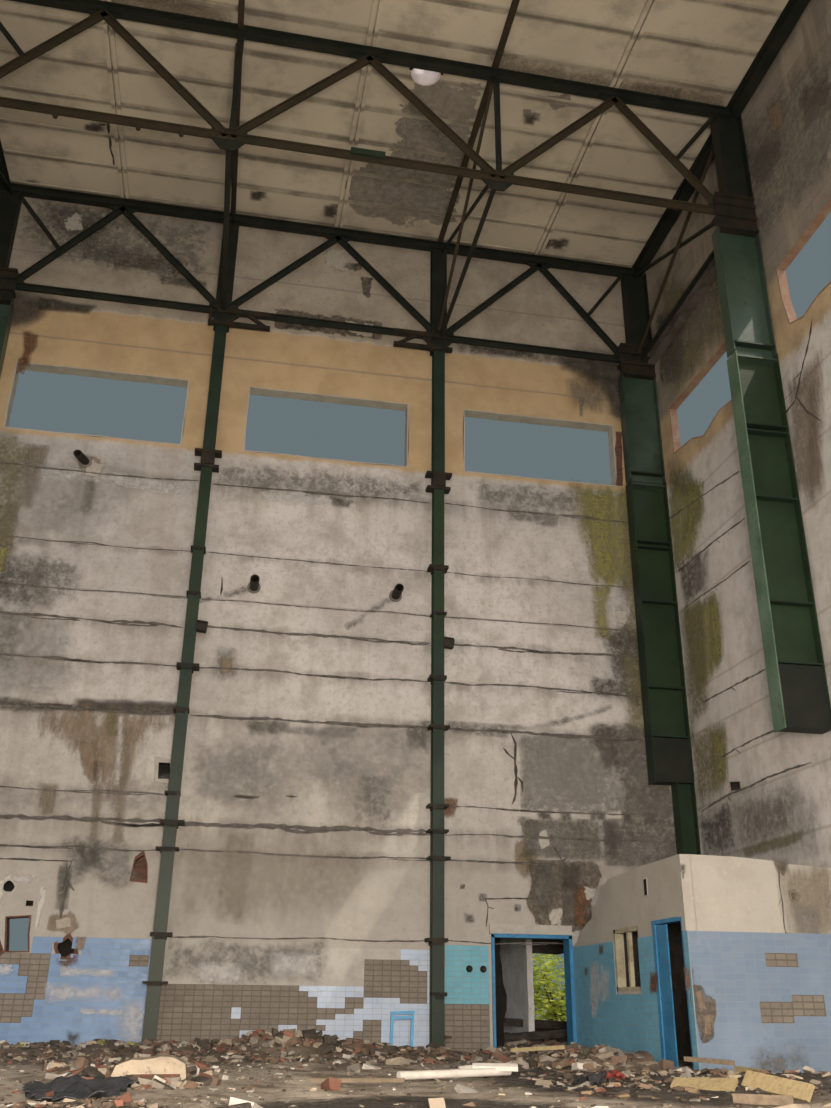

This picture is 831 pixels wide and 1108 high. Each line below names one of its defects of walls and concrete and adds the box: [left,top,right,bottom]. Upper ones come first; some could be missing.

peeling [325,81,482,226]
leakage [23,204,208,288]
leakage [0,446,74,602]
leakage [449,492,677,876]
leakage [679,555,721,717]
leakage [0,697,163,908]
crack [0,702,649,918]
peeling [0,912,78,1023]
peeling [129,955,149,967]
peeling [156,939,427,1044]
flaking render [515,859,602,932]
flaking render [690,985,717,1043]